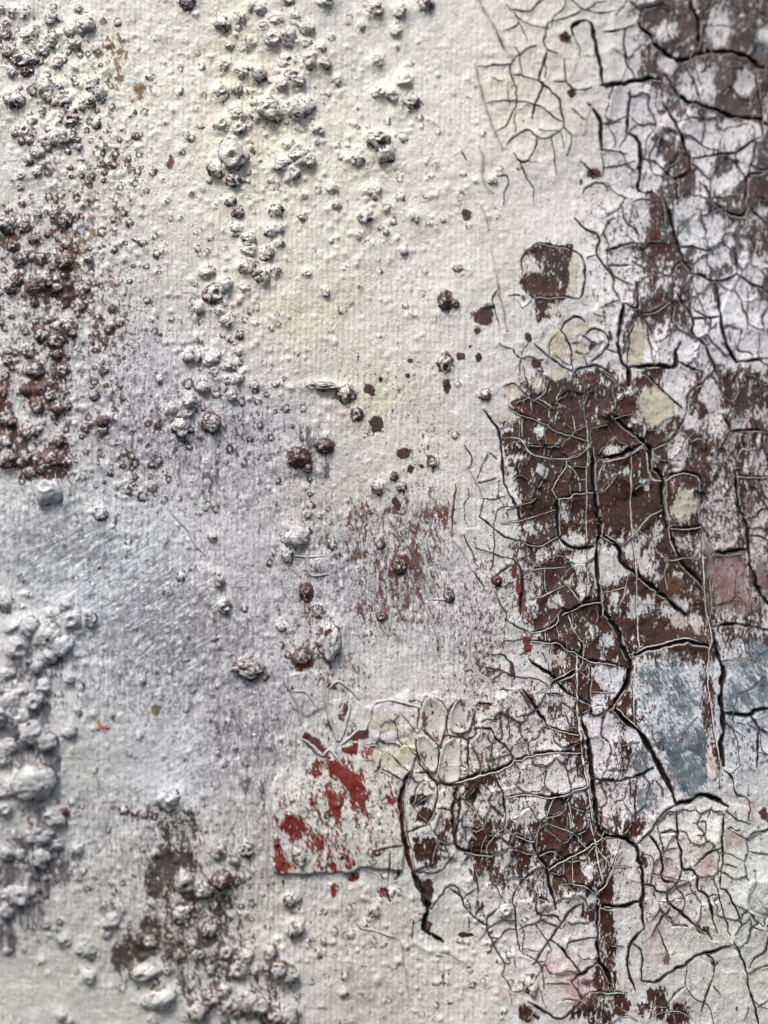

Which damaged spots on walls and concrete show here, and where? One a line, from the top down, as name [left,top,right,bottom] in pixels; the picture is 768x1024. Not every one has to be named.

corrosion [56,166,100,272]
crack [269,0,768,1024]
peeling [394,0,768,1024]